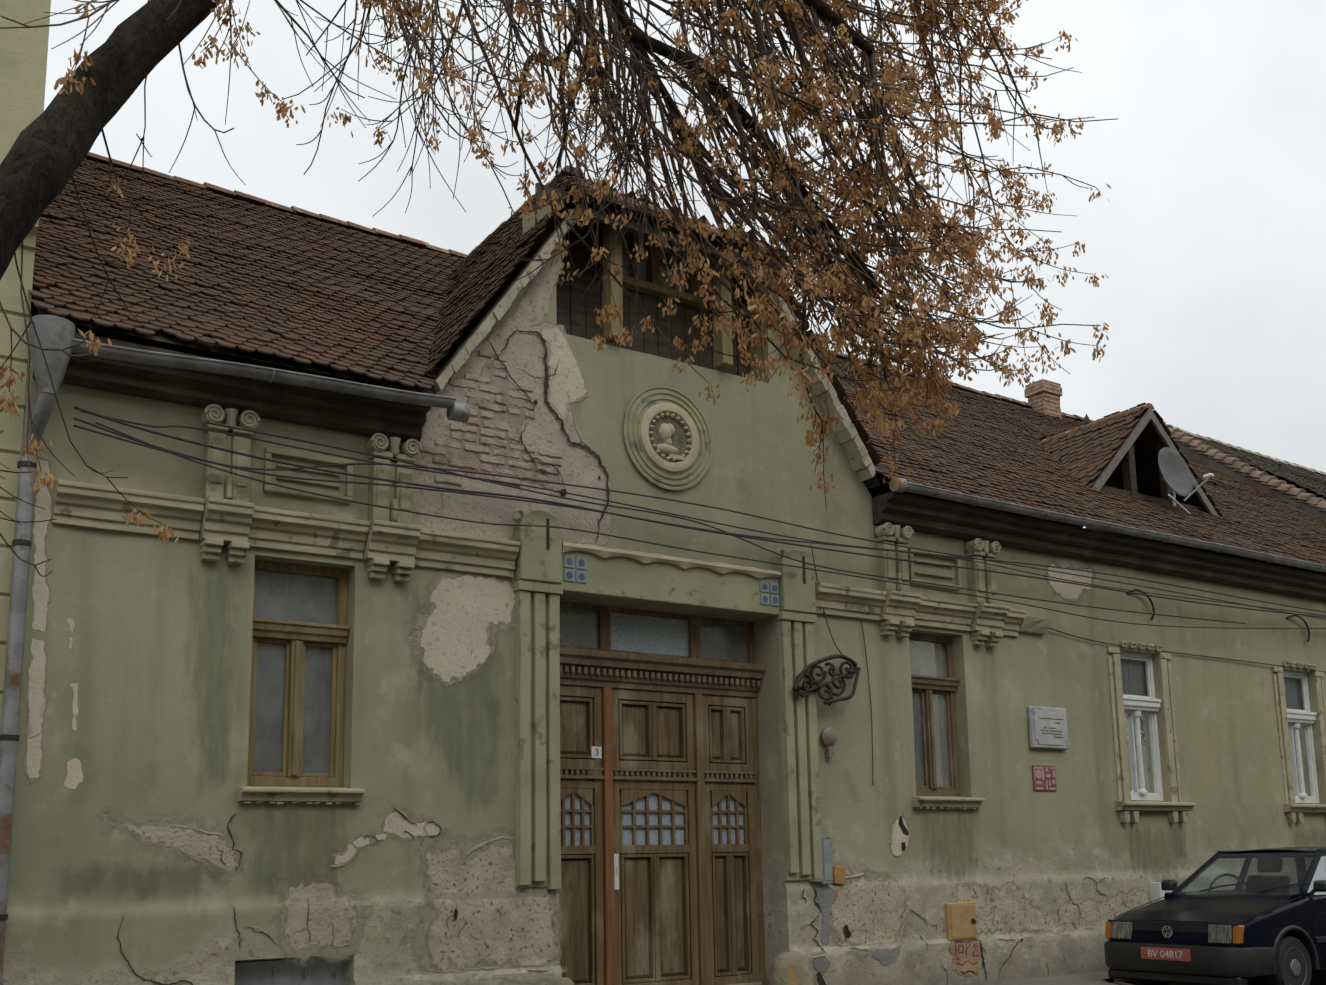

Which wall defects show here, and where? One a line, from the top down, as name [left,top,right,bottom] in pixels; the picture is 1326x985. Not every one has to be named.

flaking render [413,244,613,547]
peeling [23,456,53,784]
peeling [407,569,515,688]
peeling [64,758,84,789]
crack [117,915,193,985]
flaking render [101,814,244,877]
flaking render [270,807,561,985]
flaking render [812,869,909,985]
flaking render [889,813,910,857]